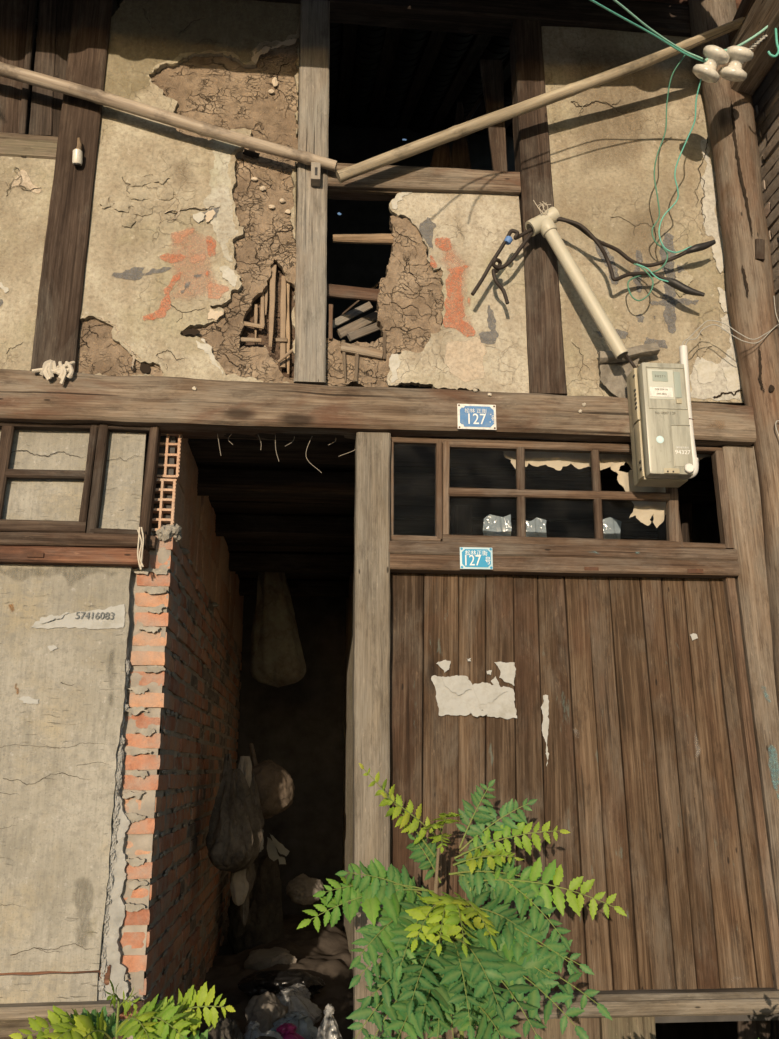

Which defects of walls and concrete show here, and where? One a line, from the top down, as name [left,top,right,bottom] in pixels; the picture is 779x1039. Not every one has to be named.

crack [114,175,218,223]
flaking render [150,39,300,383]
flaking render [700,140,725,274]
flaking render [77,319,163,376]
flaking render [325,191,444,387]
flaking render [690,287,742,401]
crack [741,265,749,296]
crack [0,743,103,795]
spalling [98,647,131,1000]
crack [10,943,90,956]